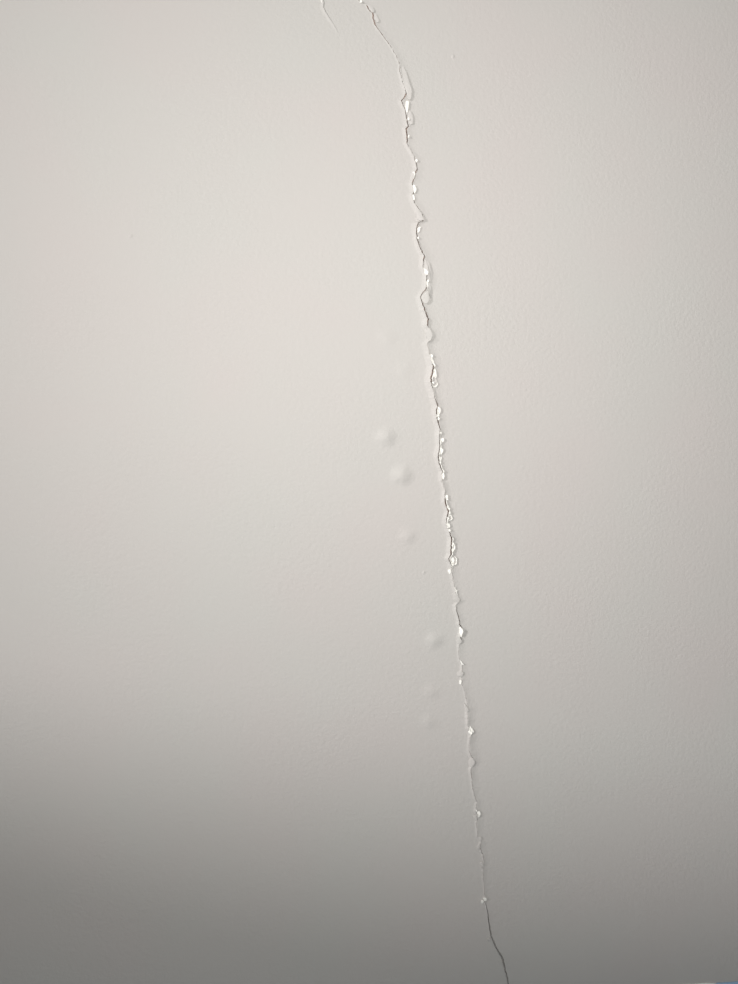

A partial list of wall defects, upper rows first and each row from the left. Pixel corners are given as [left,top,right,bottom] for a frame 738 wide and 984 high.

crack [357,0,514,984]